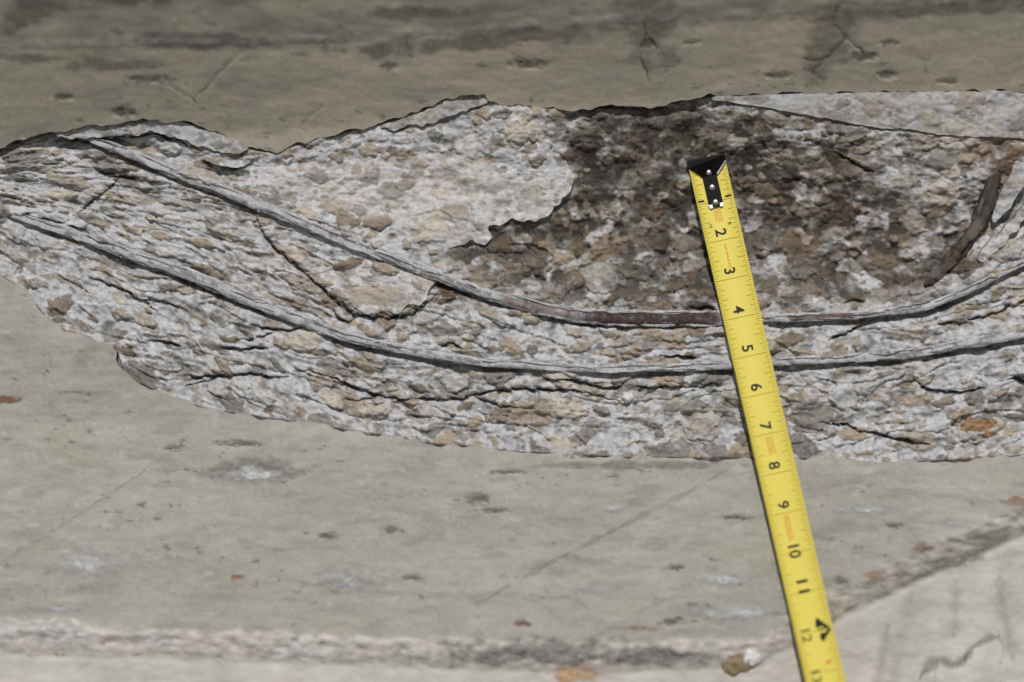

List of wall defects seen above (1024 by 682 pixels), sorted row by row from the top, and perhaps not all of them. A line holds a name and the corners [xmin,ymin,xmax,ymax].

damp [577,118,723,178]
rust [433,285,469,308]
spalling [0,81,1024,464]
rust [585,310,719,326]